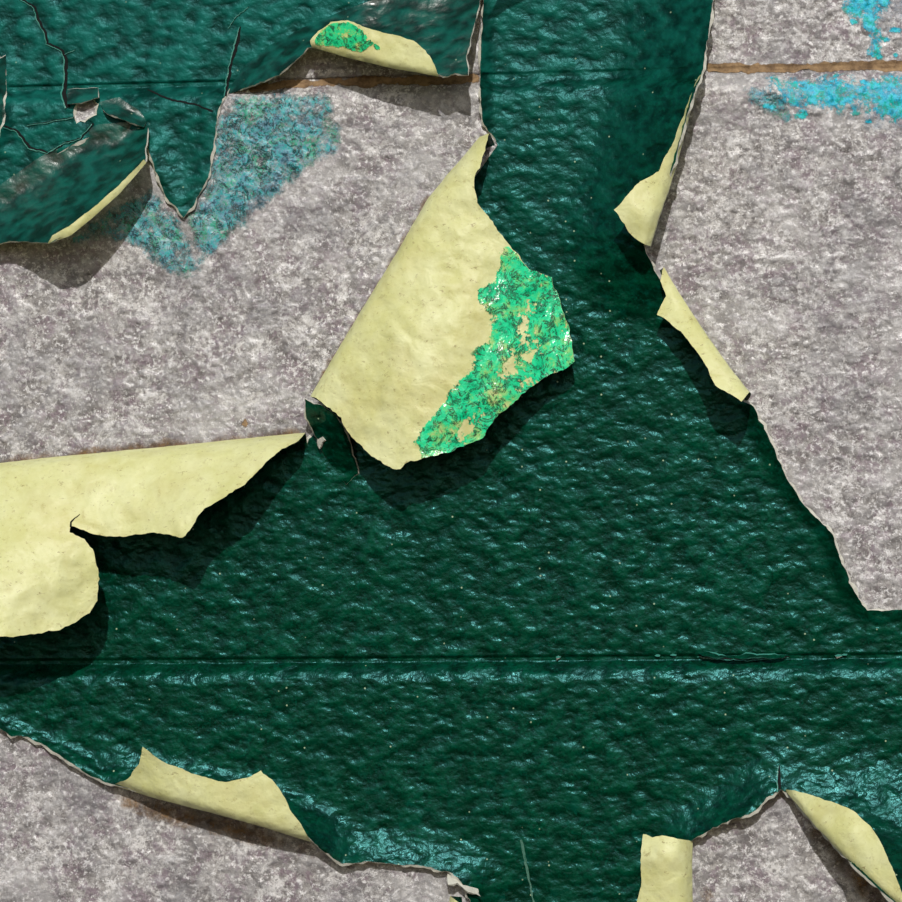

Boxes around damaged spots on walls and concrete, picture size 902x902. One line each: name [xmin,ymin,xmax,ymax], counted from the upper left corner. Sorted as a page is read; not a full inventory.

crack [2,0,94,154]
crack [147,7,248,112]
peeling [0,0,575,637]
peeling [614,0,902,610]
peeling [699,651,789,660]
peeling [0,730,480,902]
peeling [637,790,902,902]